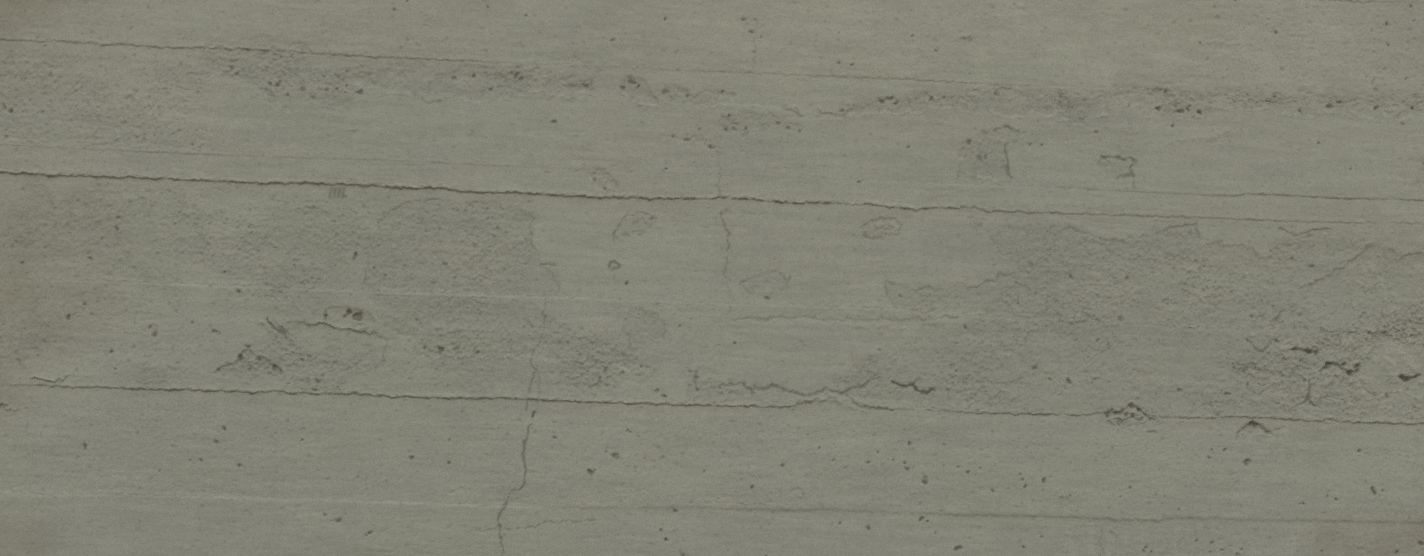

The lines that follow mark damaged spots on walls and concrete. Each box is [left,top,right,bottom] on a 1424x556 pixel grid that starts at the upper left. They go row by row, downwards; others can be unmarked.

crack [464,212,626,556]